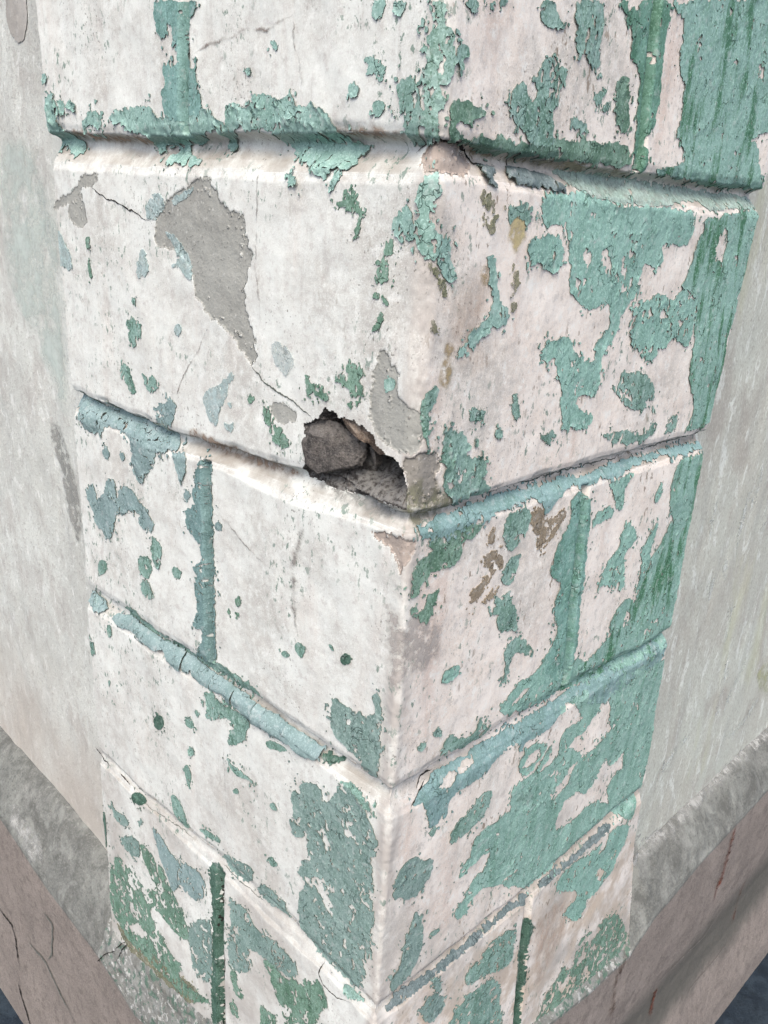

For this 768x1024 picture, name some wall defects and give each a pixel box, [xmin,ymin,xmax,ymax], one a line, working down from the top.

crack [91,185,152,224]
peeling [41,0,374,365]
crack [416,138,481,165]
peeling [76,359,263,700]
crack [252,367,314,421]
peeling [247,0,768,1024]
crack [0,910,69,1024]
peeling [102,683,387,1024]